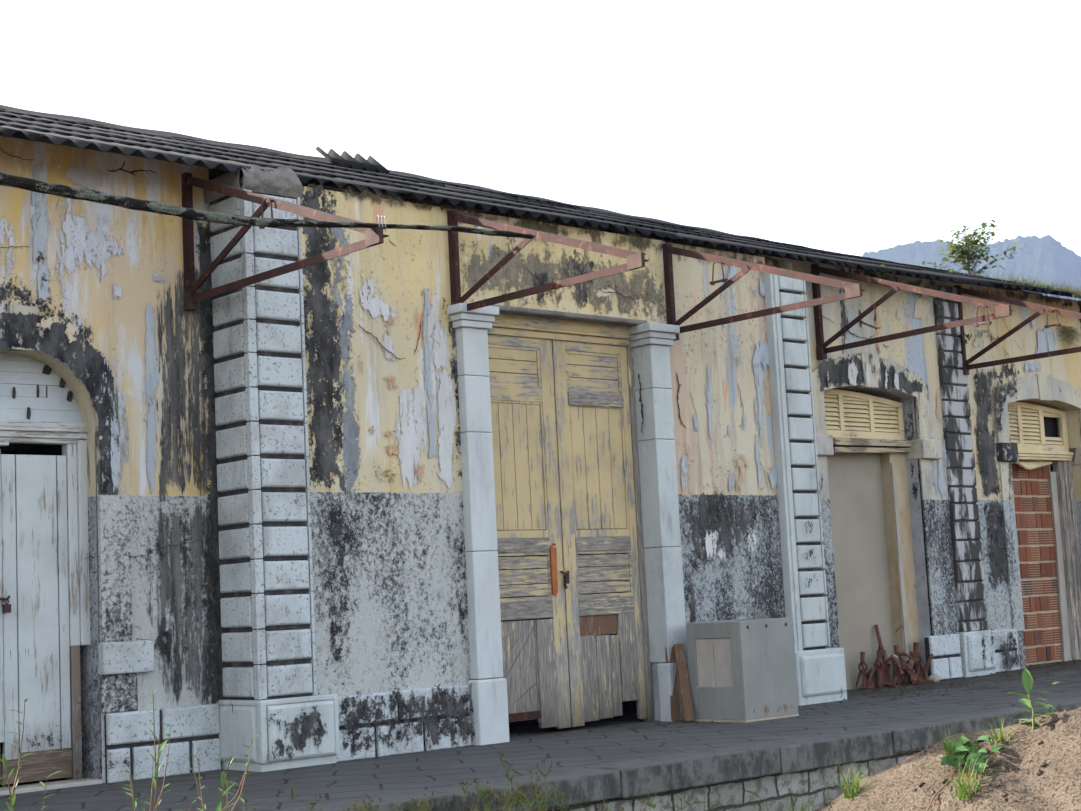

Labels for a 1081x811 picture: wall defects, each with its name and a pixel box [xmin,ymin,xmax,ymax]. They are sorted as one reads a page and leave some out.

peeling [0,213,17,277]
water stain [0,250,116,493]
peeling [31,162,126,304]
water stain [147,220,225,705]
peeling [359,271,398,362]
peeling [369,289,458,494]
water stain [300,183,790,670]
peeling [680,338,778,491]
water stain [972,364,1020,590]
mould [75,682,151,779]